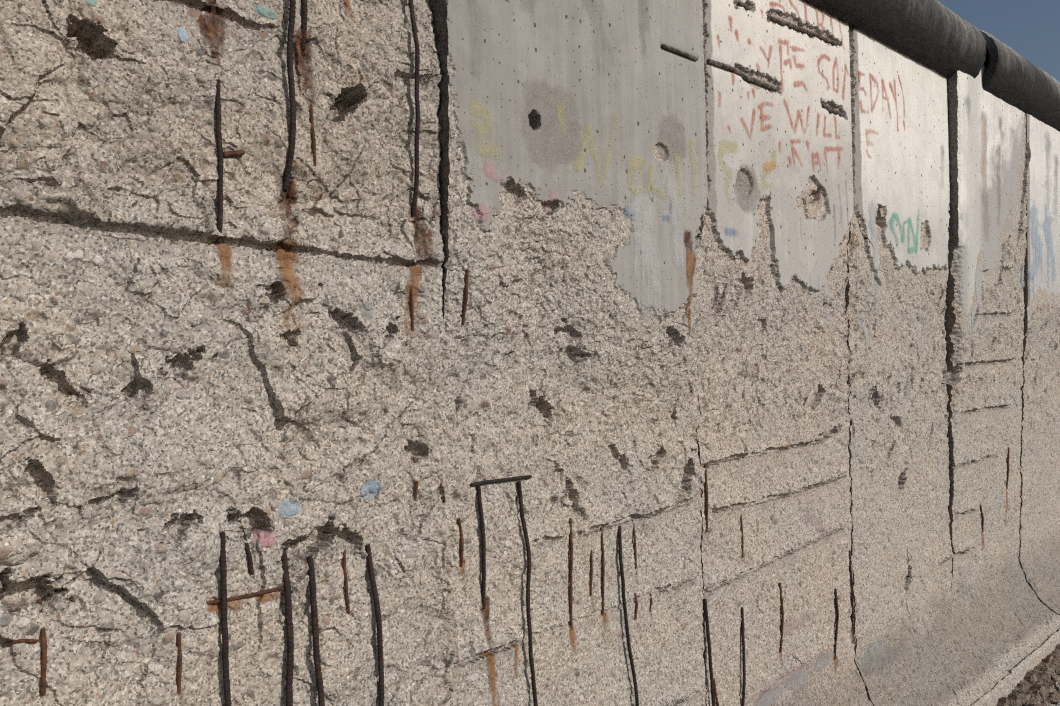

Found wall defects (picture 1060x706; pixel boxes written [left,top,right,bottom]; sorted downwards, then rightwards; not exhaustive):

rust [199,0,225,64]
rust [293,30,315,103]
spalling [734,63,781,95]
spalling [765,9,856,194]
rust [213,242,233,286]
rust [273,177,302,328]
rust [685,232,696,334]
spalling [0,0,456,706]
spalling [442,84,1060,706]
rust [481,596,497,706]